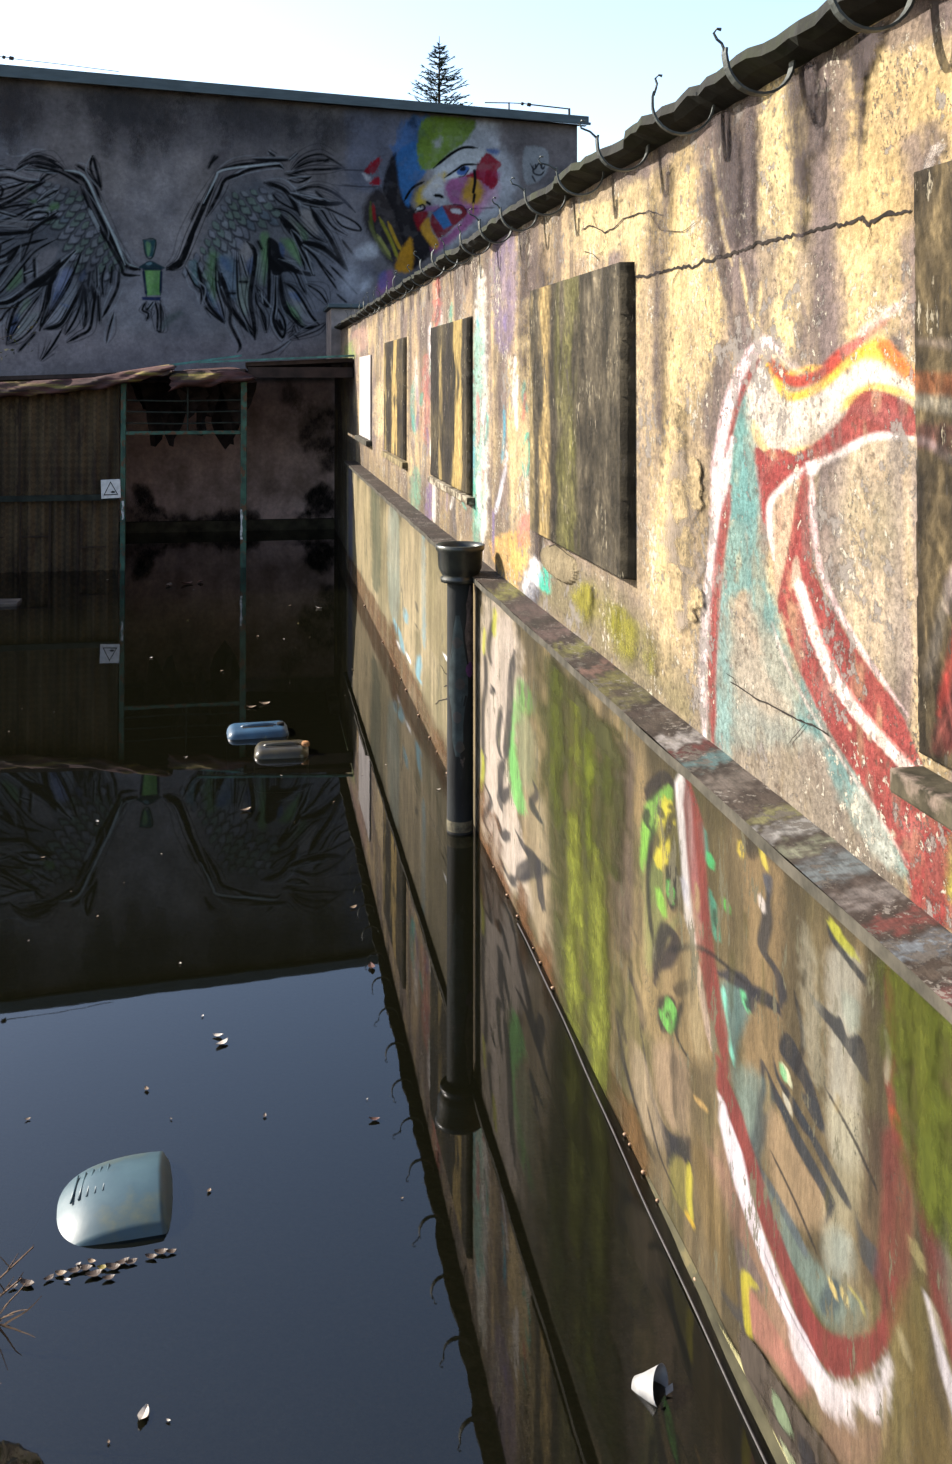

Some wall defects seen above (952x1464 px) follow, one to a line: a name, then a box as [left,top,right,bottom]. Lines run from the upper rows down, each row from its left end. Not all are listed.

crack [581,208,911,293]
damp [551,667,610,1084]